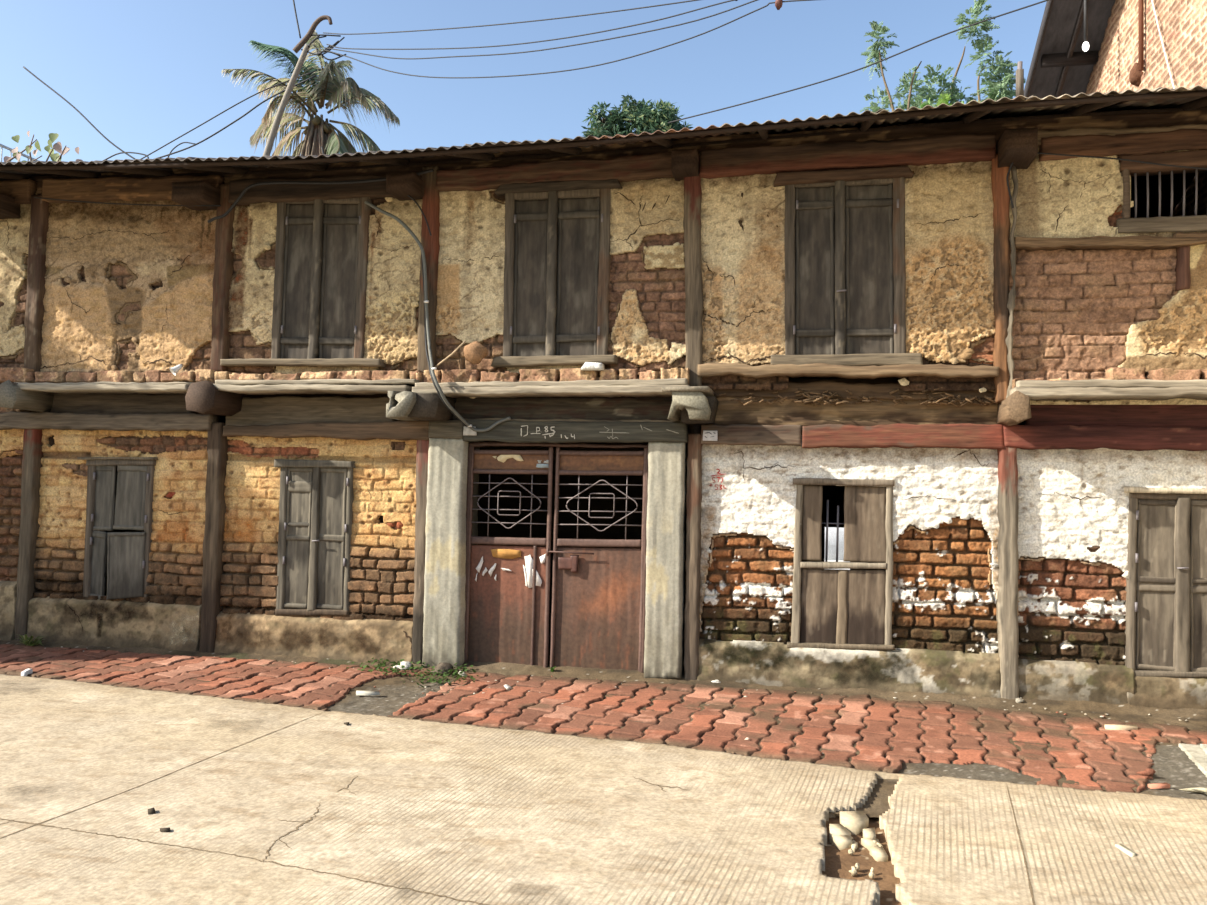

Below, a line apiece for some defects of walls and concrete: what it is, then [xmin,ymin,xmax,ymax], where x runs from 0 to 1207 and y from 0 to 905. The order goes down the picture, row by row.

spalling [62,259,163,371]
spalling [604,229,686,372]
spalling [702,360,788,391]
spalling [898,247,1178,393]
spalling [96,433,208,456]
spalling [0,449,23,581]
damp [32,576,200,636]
damp [220,602,259,626]
damp [238,610,413,652]
spalling [700,532,794,644]
spalling [892,513,999,654]
spalling [1017,546,1128,666]